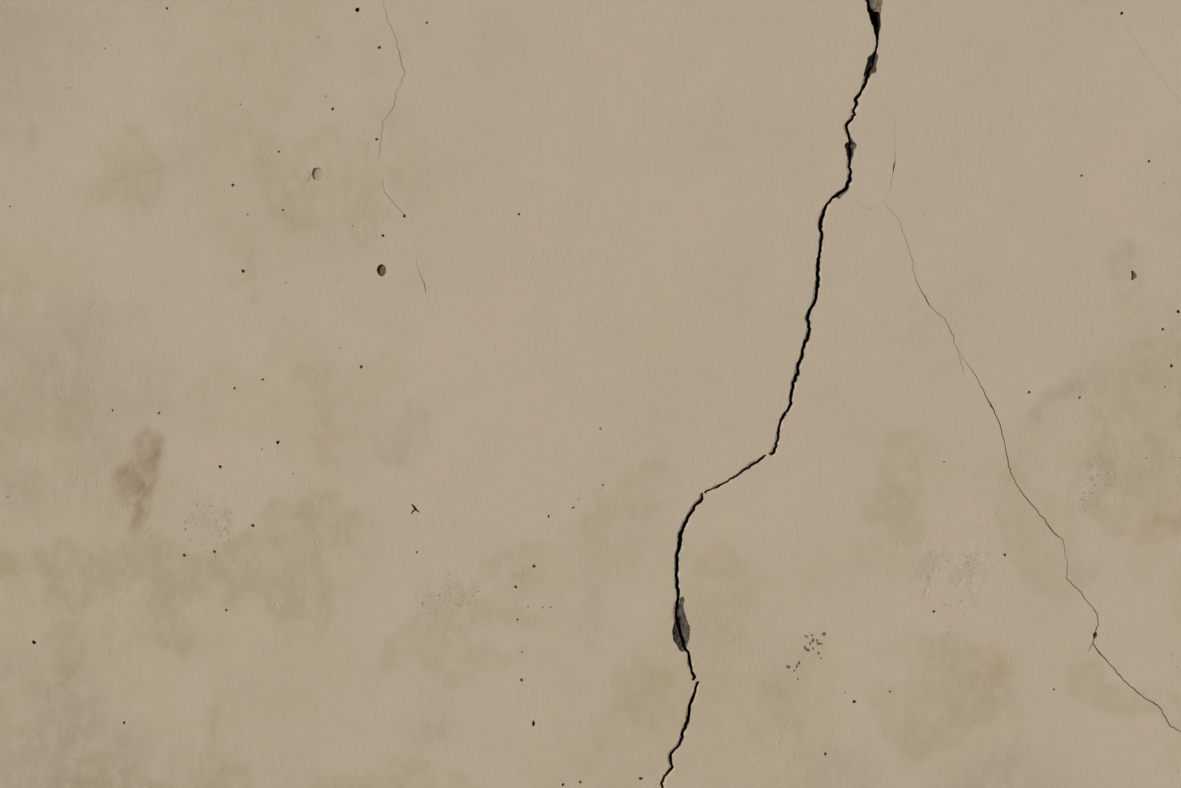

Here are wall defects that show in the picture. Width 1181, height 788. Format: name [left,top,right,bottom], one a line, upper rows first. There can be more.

crack [660,0,1181,788]